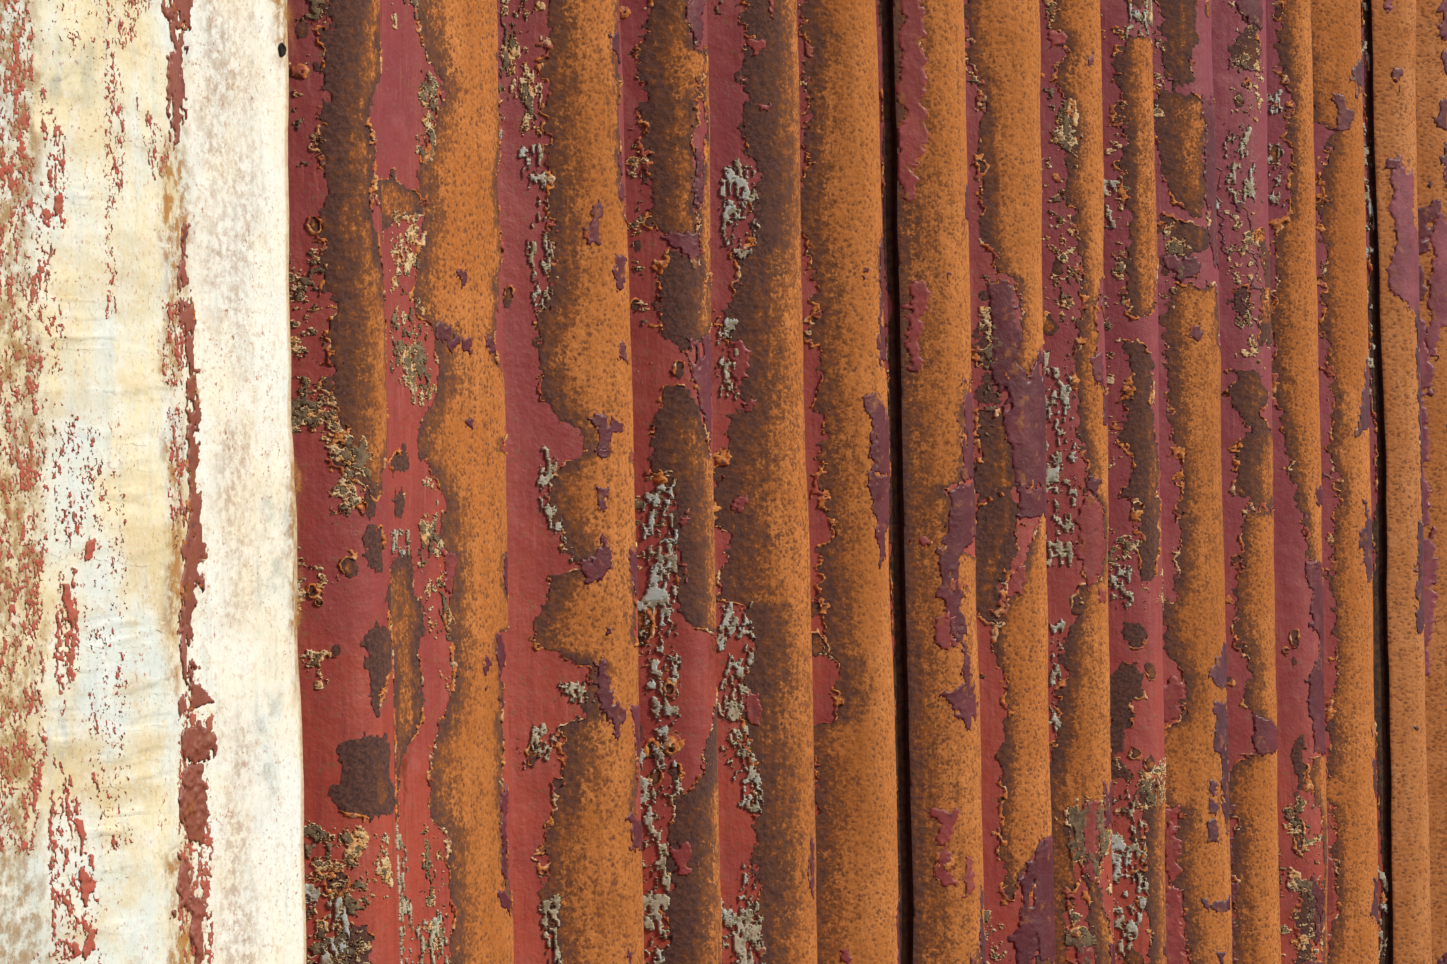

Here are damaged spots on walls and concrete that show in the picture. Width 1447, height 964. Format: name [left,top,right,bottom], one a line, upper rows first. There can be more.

peeling [1041,88,1079,322]
peeling [1217,15,1286,371]
peeling [0,0,193,964]
peeling [162,222,215,964]
peeling [304,820,449,964]
rust [274,0,515,964]
peeling [391,475,456,650]
peeling [635,470,685,964]
rust [524,0,1390,964]
peeling [1043,349,1078,567]
peeling [1054,757,1166,964]
peeling [1108,528,1164,610]